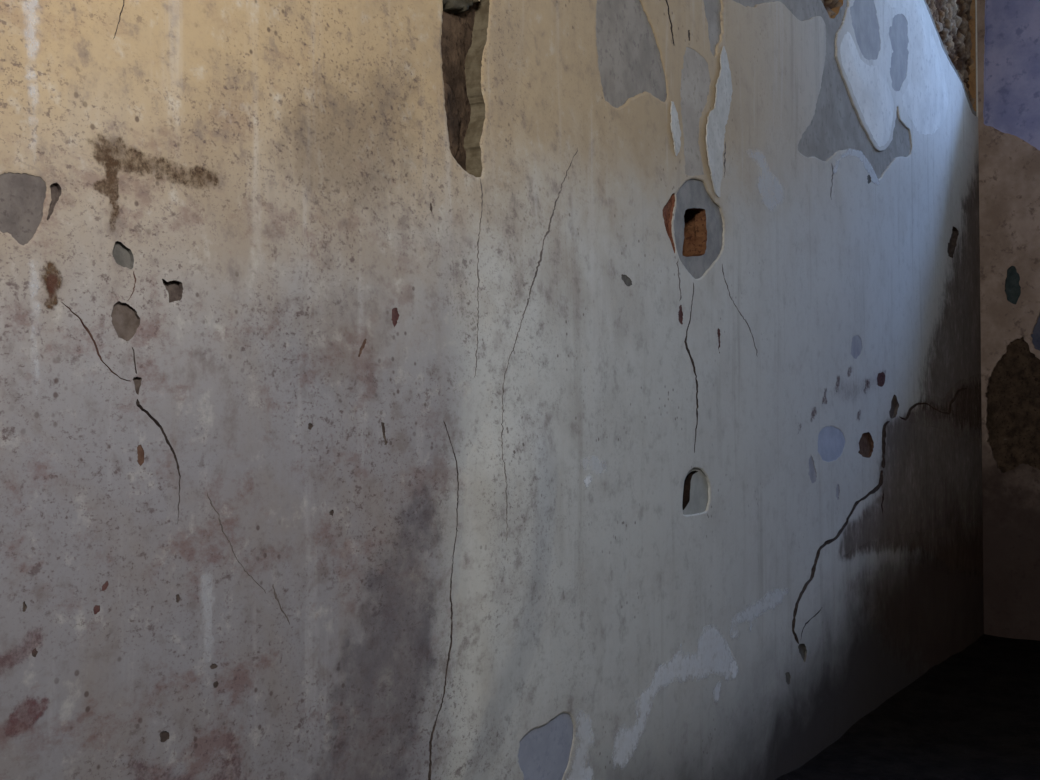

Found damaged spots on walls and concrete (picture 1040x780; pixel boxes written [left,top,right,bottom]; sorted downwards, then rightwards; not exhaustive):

flaking render [439,0,492,180]
flaking render [594,0,681,156]
flaking render [662,0,913,280]
flaking render [924,0,1040,151]
crack [62,302,181,524]
crack [428,422,459,780]
crack [501,150,578,540]
crack [676,261,699,453]
leakage [613,589,785,768]
crack [792,394,956,644]
leakage [840,167,983,576]
flaking render [984,310,1040,475]